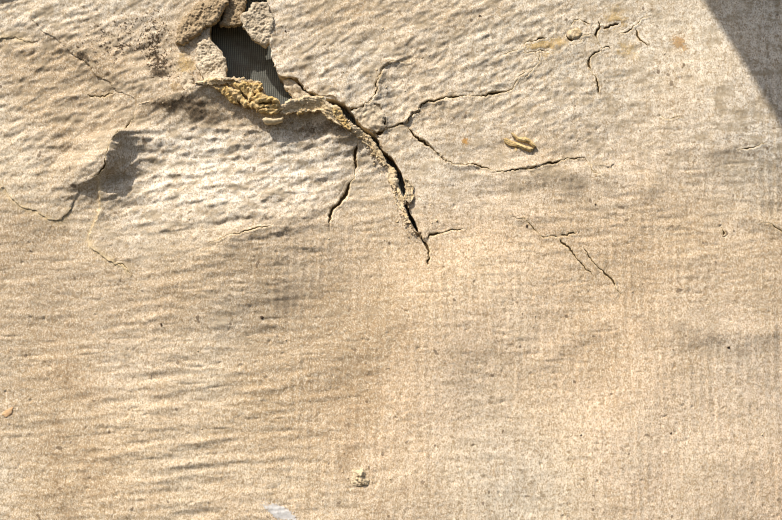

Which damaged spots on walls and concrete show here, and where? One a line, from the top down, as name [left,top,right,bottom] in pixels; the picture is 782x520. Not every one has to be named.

crack [84,89,117,100]
crack [85,105,138,183]
flaking render [0,0,354,281]
crack [175,0,655,269]
flaking render [267,0,621,239]
crack [505,212,628,304]